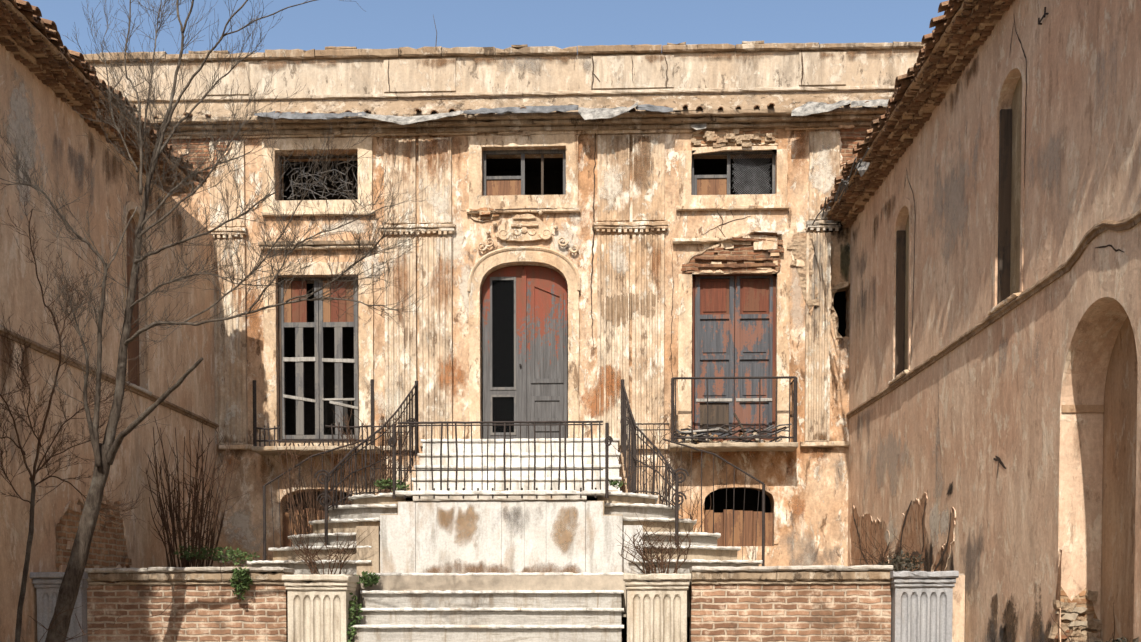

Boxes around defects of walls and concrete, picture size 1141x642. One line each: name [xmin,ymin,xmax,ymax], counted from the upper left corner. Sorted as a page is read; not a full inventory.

flaking render [681,227,848,338]
flaking render [56,498,85,572]
flaking render [85,496,132,568]
flaking render [850,428,956,572]
peeling [987,593,1018,642]
spalling [1031,549,1103,642]